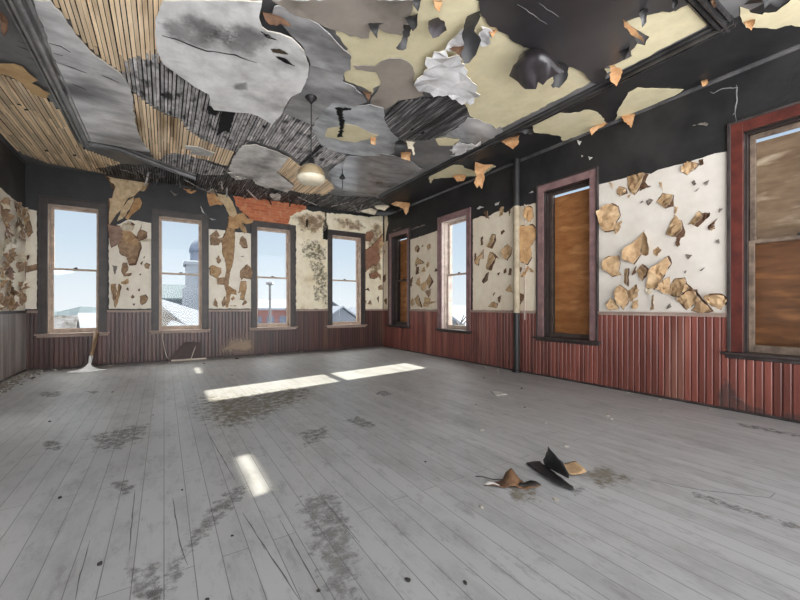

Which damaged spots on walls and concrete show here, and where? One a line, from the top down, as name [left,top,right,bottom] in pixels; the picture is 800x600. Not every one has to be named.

flaking render [335,0,684,149]
flaking render [604,0,707,86]
flaking render [740,0,800,30]
peeling [0,197,37,311]
peeling [106,176,151,307]
spalling [208,105,235,136]
flaking render [201,193,410,309]
damp [302,241,326,304]
flaking render [299,124,378,166]
flaking render [429,162,496,189]
peeling [601,232,727,313]
peeling [609,173,722,247]